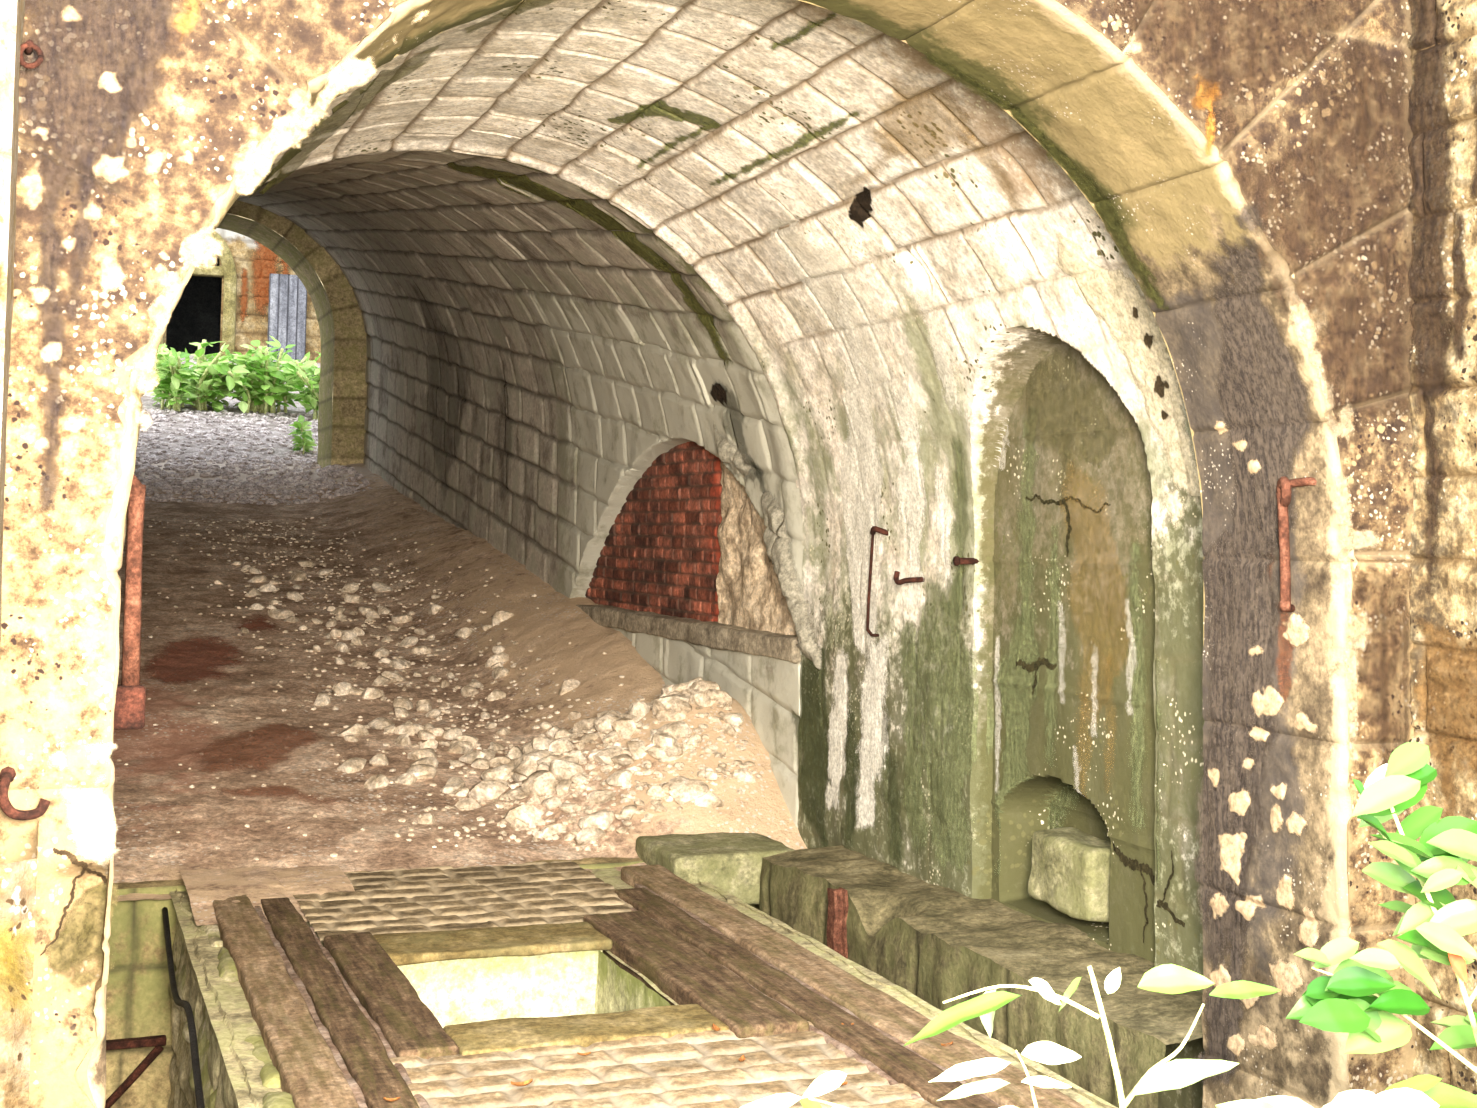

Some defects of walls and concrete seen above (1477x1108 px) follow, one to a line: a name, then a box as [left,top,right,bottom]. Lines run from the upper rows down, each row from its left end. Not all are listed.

spalling [235,58,374,194]
leakage [19,0,174,509]
spalling [180,227,221,266]
spalling [149,268,179,328]
peeling [1214,421,1261,474]
peeling [1283,613,1310,647]
peeling [1249,686,1317,742]
peeling [1208,768,1319,948]
spalling [48,752,187,1108]
peeling [1209,964,1231,988]
peeling [1269,959,1303,996]
peeling [1227,1025,1277,1057]